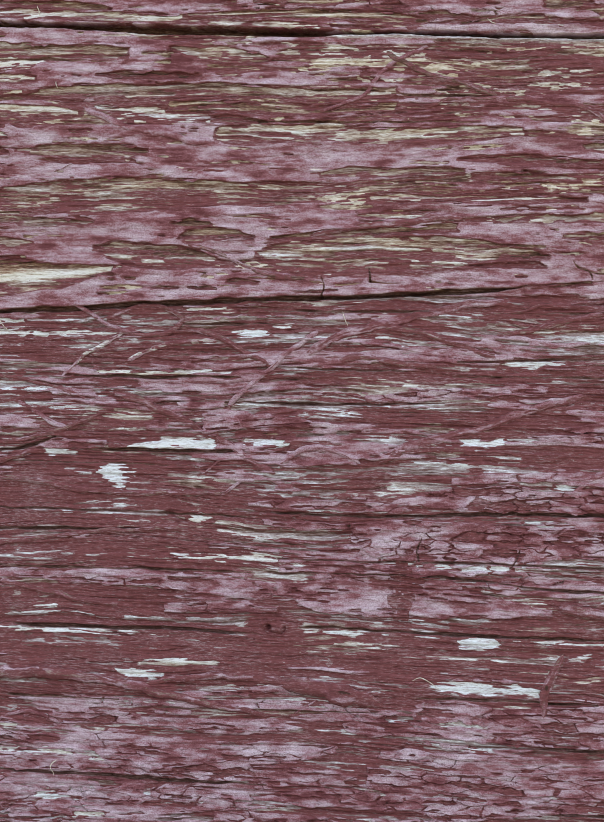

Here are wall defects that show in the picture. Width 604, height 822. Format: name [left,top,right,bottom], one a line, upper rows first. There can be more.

peeling [0,0,594,34]
peeling [0,70,524,145]
peeling [0,140,604,227]
peeling [0,219,254,296]
peeling [257,223,550,277]
crack [0,268,522,325]
peeling [127,435,217,451]
peeling [95,463,137,491]
crack [0,473,604,642]
peeling [458,638,501,651]
peeling [426,681,540,698]
crack [0,693,604,822]